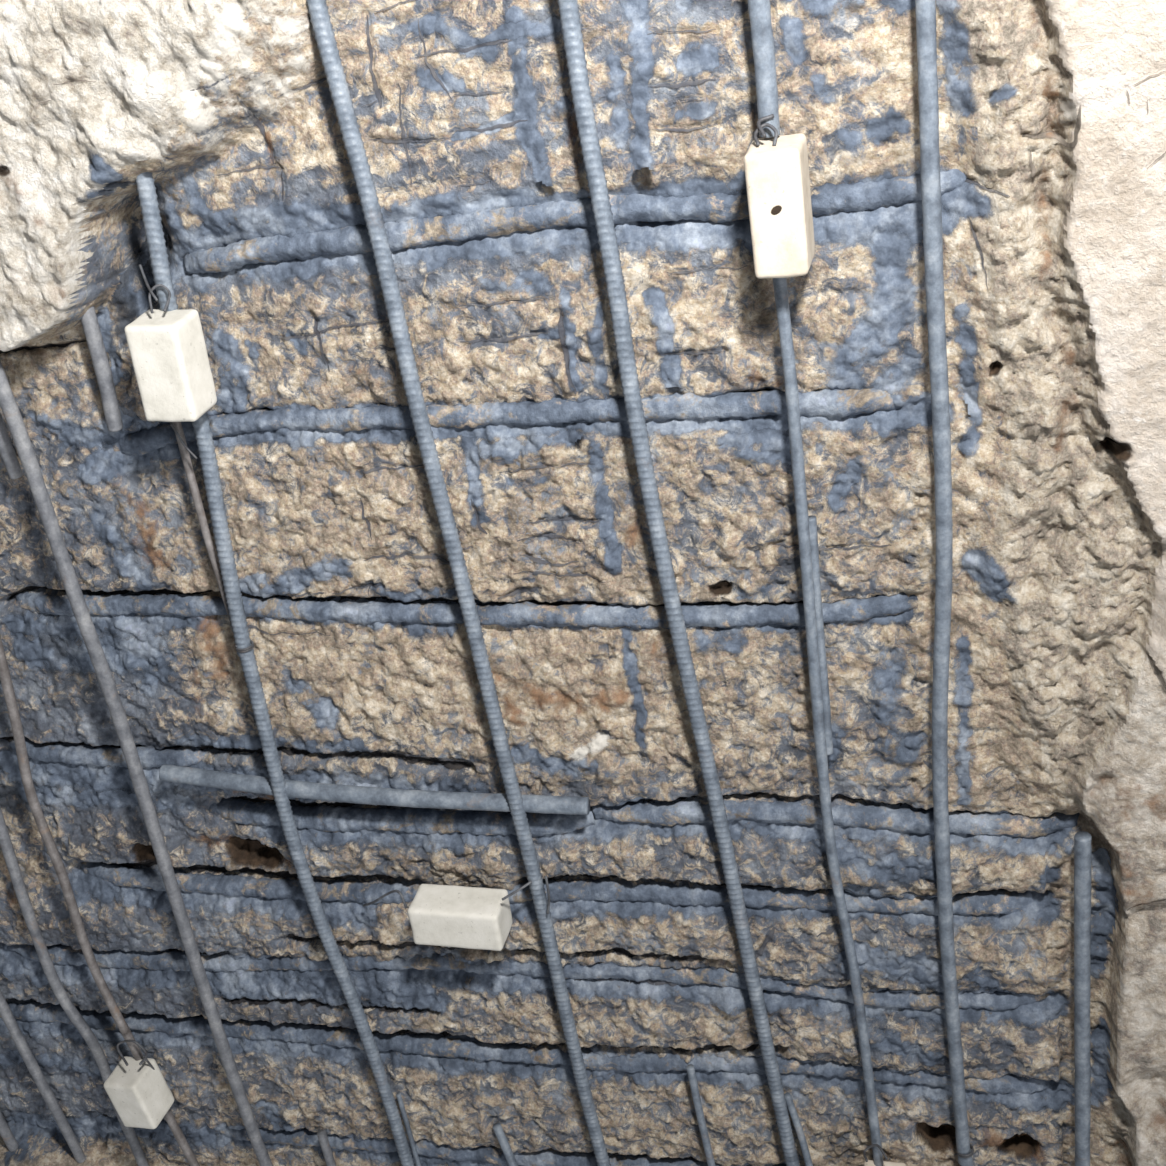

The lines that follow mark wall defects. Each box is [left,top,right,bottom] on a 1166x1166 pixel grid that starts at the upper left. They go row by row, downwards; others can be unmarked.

spalling [246,617,505,793]
spalling [481,624,709,807]
spalling [686,626,821,808]
crack [1146,653,1166,689]
spalling [302,836,528,890]
spalling [532,829,725,887]
spalling [0,802,151,1166]
spalling [362,977,568,1053]
spalling [553,908,744,973]
spalling [568,989,762,1063]
spalling [950,842,1075,1087]
spalling [383,1058,594,1153]